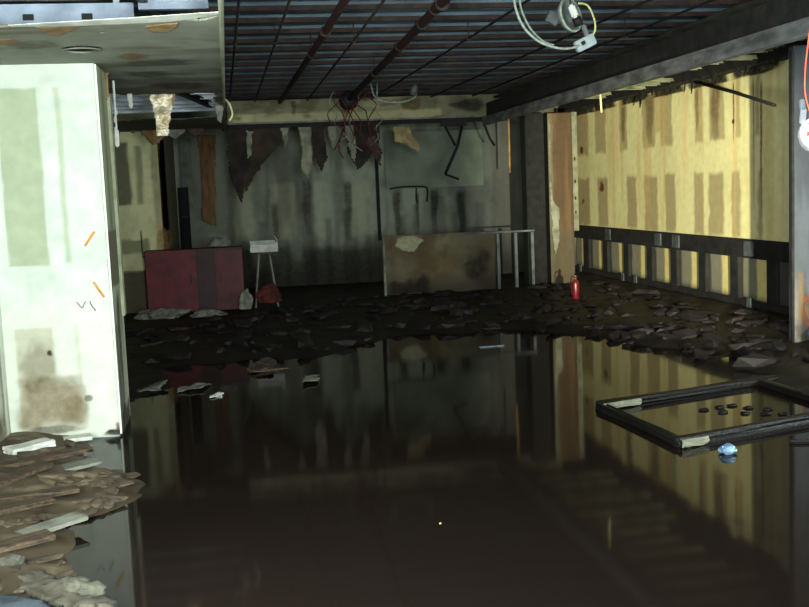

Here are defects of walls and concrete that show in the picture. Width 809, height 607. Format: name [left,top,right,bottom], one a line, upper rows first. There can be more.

leakage [574,63,779,128]
leakage [753,86,762,180]